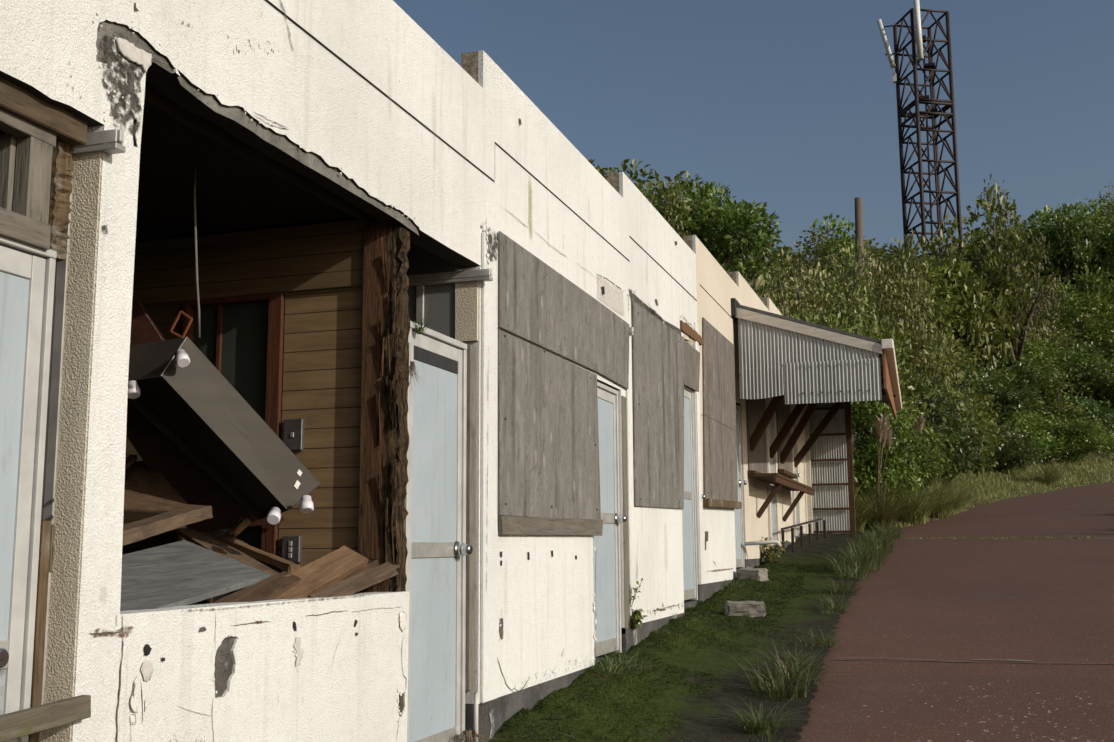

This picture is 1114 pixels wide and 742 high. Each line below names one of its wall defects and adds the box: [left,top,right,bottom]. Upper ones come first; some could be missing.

spalling [92,3,419,235]
rust [90,627,133,637]
crack [116,615,124,742]
spalling [213,634,236,698]